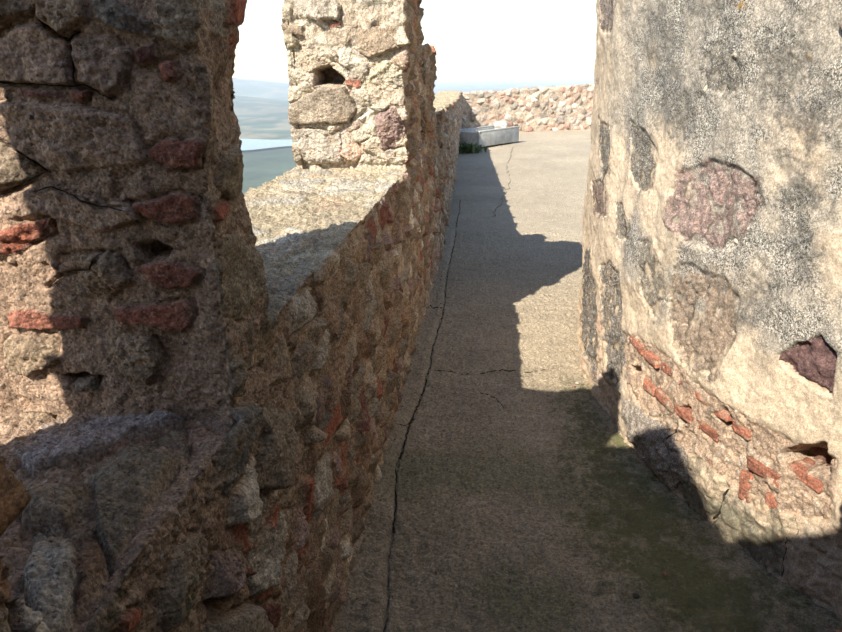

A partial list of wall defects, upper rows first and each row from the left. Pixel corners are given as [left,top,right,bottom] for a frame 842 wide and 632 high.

crack [383,200,554,632]